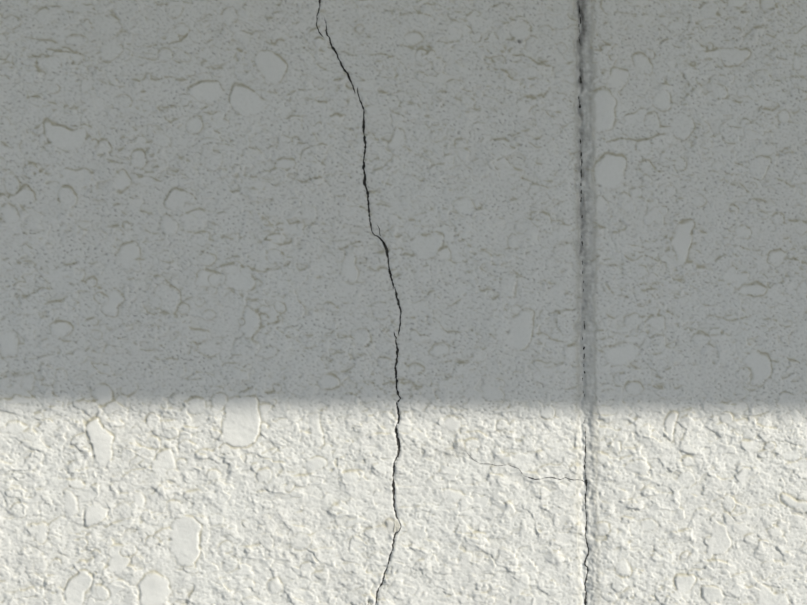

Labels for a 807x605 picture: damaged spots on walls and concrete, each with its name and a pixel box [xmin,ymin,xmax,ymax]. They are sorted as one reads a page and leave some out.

crack [316,0,402,603]
crack [467,420,589,605]